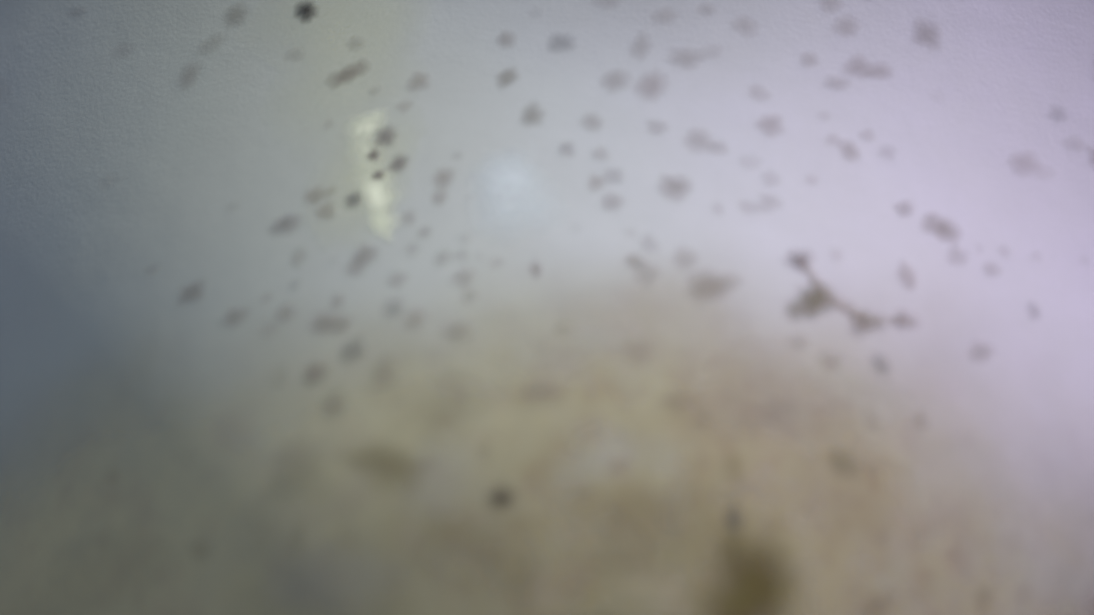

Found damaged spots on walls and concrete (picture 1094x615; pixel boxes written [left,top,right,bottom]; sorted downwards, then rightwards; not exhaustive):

damp [365,173,389,226]
damp [0,357,1094,615]